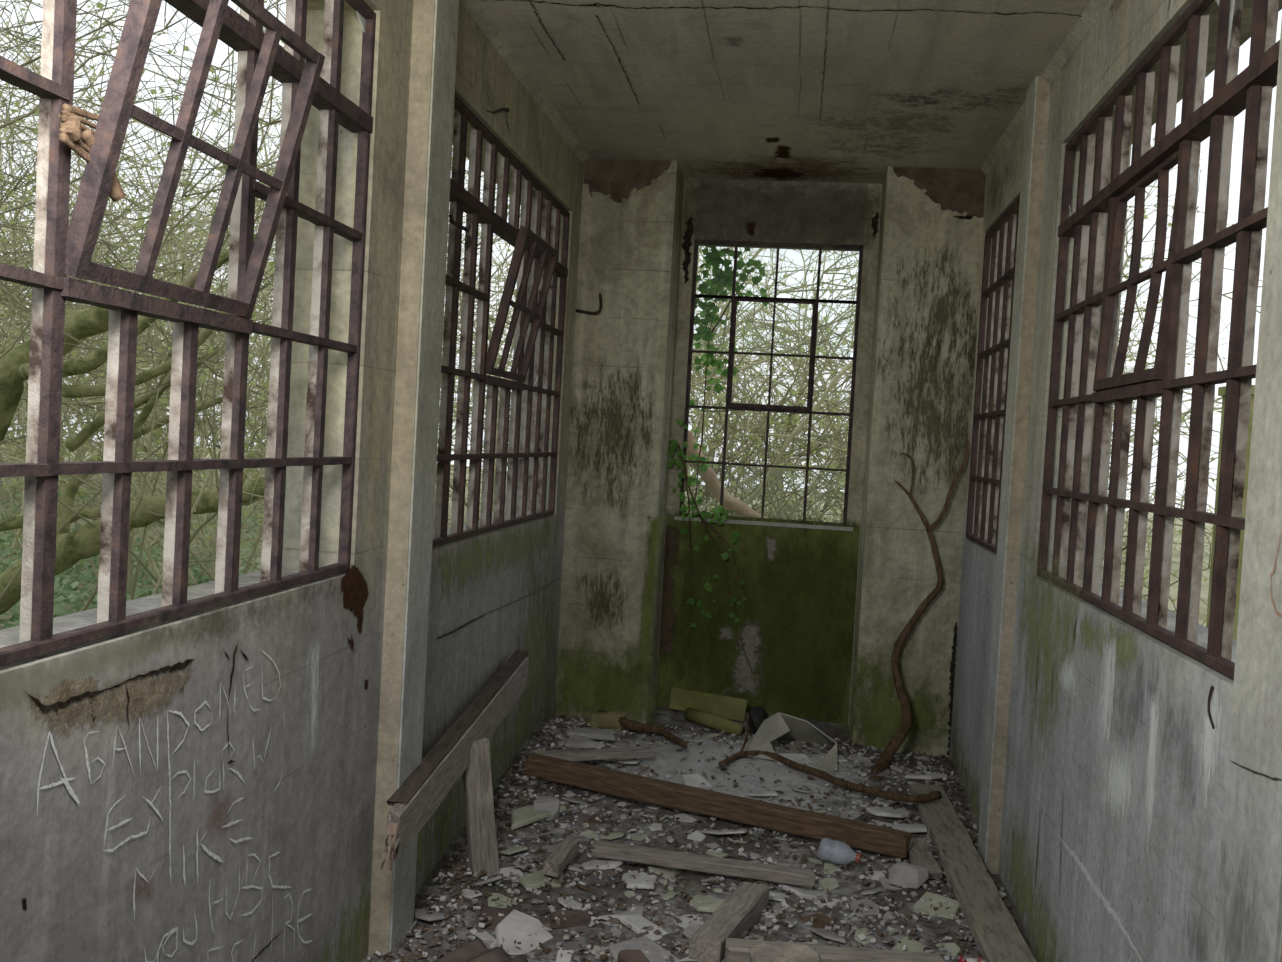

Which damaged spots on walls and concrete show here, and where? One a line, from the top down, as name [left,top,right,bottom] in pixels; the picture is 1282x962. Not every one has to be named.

crack [521,0,1082,120]
flaking render [584,159,672,203]
flaking render [893,167,986,219]
leakage [568,371,651,508]
rust [341,565,368,651]
leakage [578,570,624,628]
leakage [659,527,680,655]
spalling [24,659,195,732]
leakage [1099,639,1160,854]
leakage [1185,684,1222,801]
crack [1230,760,1282,780]